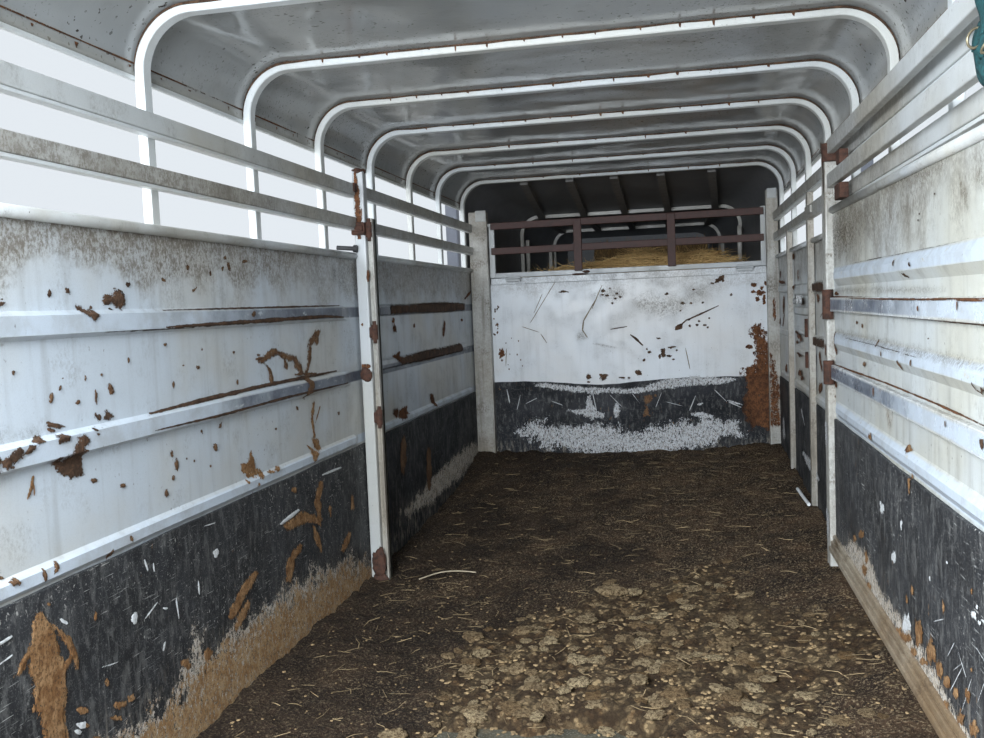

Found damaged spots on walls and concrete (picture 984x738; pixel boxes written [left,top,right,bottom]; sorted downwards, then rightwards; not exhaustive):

corrosion [0,0,219,74]
corrosion [151,5,948,111]
corrosion [255,59,861,222]
corrosion [750,270,799,326]
corrosion [801,282,823,305]
corrosion [833,291,984,326]
corrosion [149,370,337,414]
corrosion [155,382,348,431]
corrosion [739,323,803,432]
corrosion [795,331,984,426]